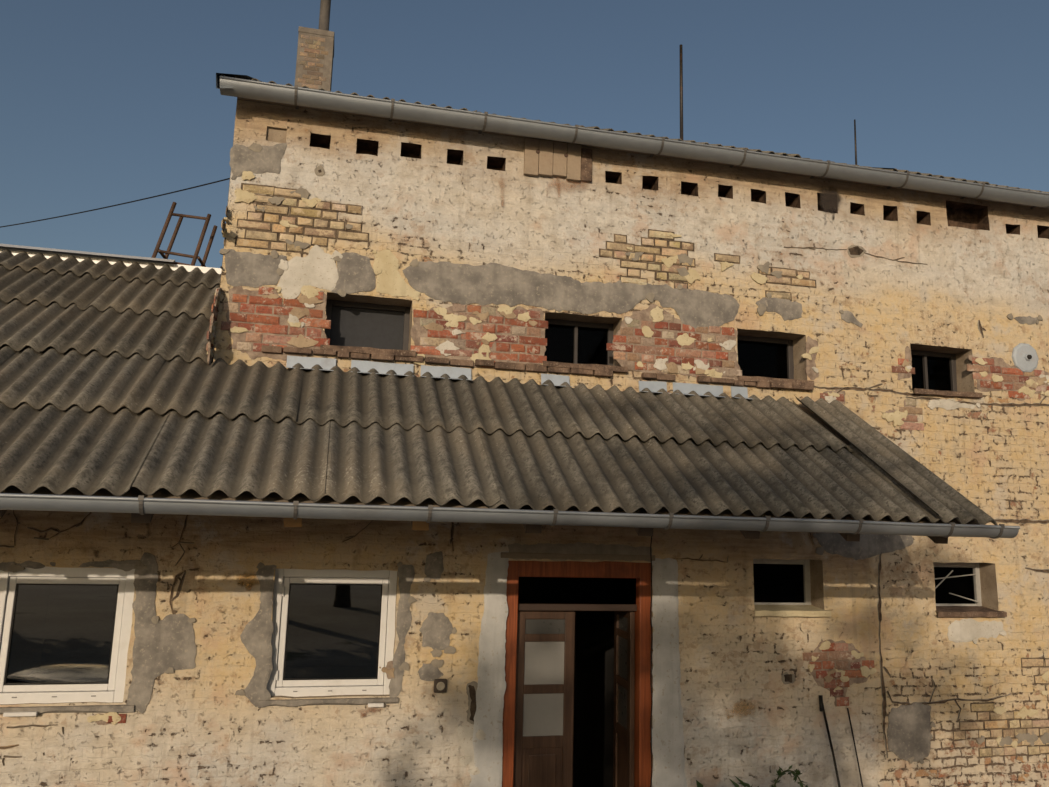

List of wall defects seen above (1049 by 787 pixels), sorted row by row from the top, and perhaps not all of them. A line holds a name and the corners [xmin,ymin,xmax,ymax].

spalling [206,171,369,365]
spalling [599,229,700,289]
flaking render [410,303,548,368]
flaking render [606,304,742,385]
flaking render [966,355,1049,408]
crack [0,510,92,548]
crack [988,517,1049,525]
crack [168,515,195,614]
crack [1025,566,1049,574]
flaking render [803,639,877,707]
crack [877,552,1011,758]
spalling [952,658,1049,763]